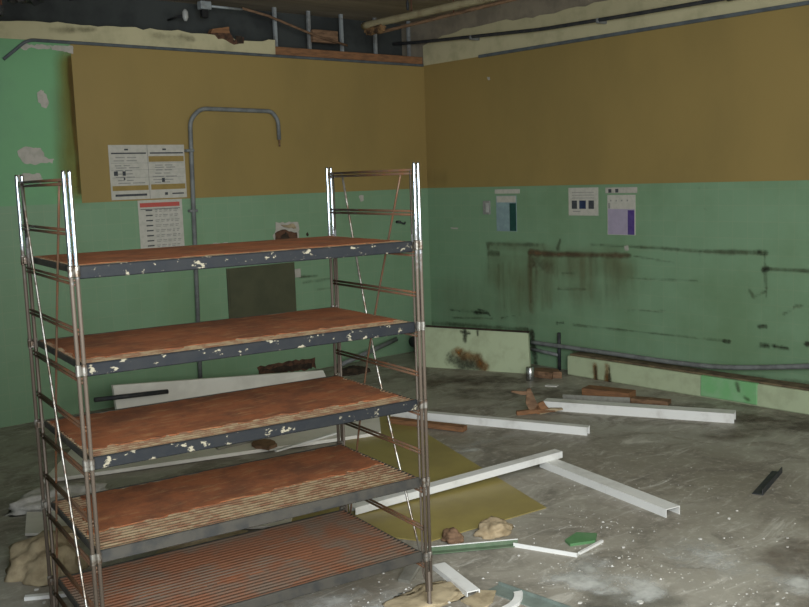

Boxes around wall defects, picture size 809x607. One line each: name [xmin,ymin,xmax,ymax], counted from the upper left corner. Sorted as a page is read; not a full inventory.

peeling [37,90,49,108]
peeling [17,146,54,184]
corrosion [528,250,628,266]